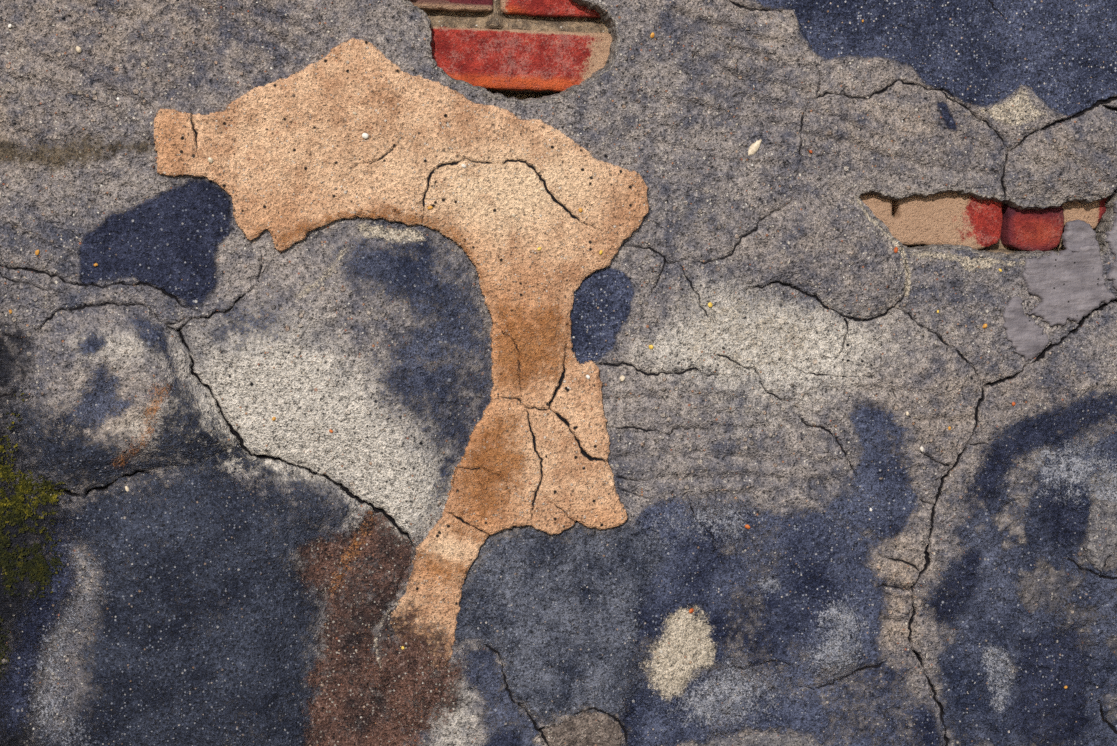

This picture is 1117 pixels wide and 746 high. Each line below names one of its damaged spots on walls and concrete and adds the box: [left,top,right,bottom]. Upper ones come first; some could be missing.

spalling [401,0,621,104]
water stain [756,0,1117,131]
water stain [79,179,232,308]
spalling [857,188,1117,259]
water stain [0,318,359,746]
crack [0,259,413,591]
rust [295,510,469,746]
peeling [390,509,489,669]
crack [495,325,654,520]
peeling [527,341,628,535]
water stain [455,390,1117,746]
crack [725,257,1117,746]